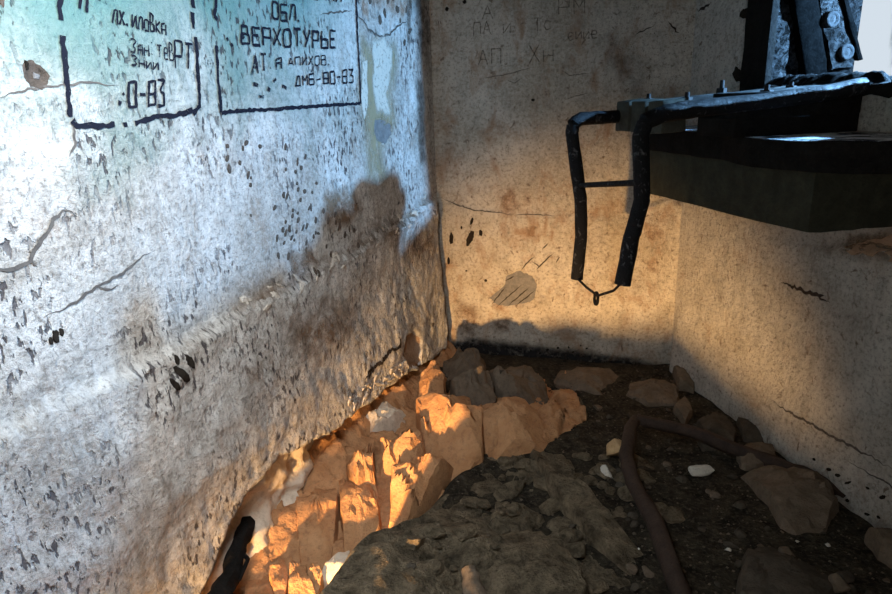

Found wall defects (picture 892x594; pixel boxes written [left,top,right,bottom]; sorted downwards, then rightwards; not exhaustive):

crack [69,124,77,155]
crack [0,209,78,272]
crack [48,252,151,315]
crack [781,282,830,303]
crack [774,401,892,488]